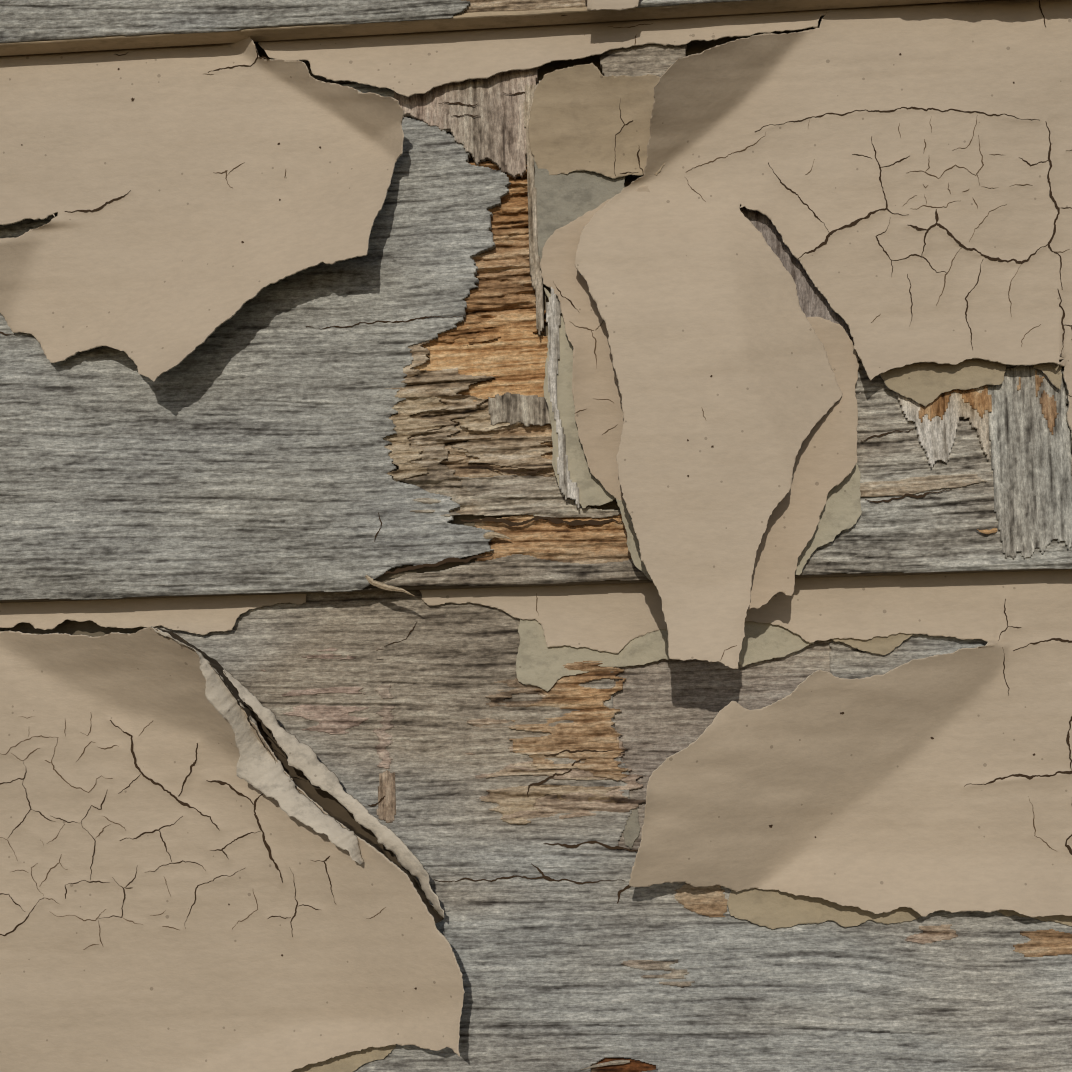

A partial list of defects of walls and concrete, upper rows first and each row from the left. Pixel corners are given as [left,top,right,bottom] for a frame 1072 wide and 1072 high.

peeling [258,9,829,98]
peeling [0,37,511,635]
peeling [385,0,1072,800]
crack [687,107,1072,361]
crack [0,716,336,950]
peeling [0,570,1072,1072]
crack [964,716,1072,855]